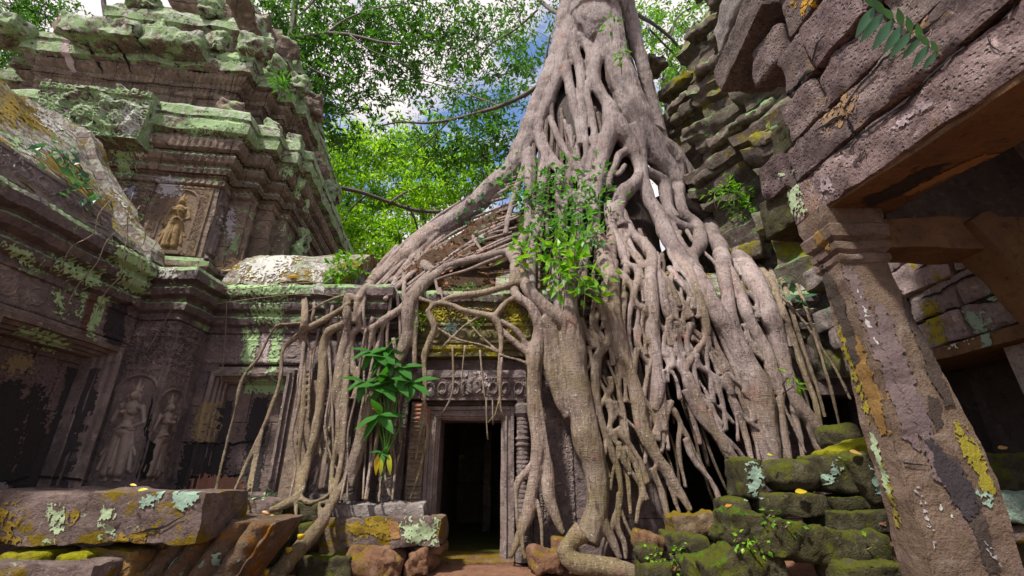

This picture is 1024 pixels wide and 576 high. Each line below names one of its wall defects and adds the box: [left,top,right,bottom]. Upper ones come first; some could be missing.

crack [802,1,1021,181]
water stain [0,366,101,488]